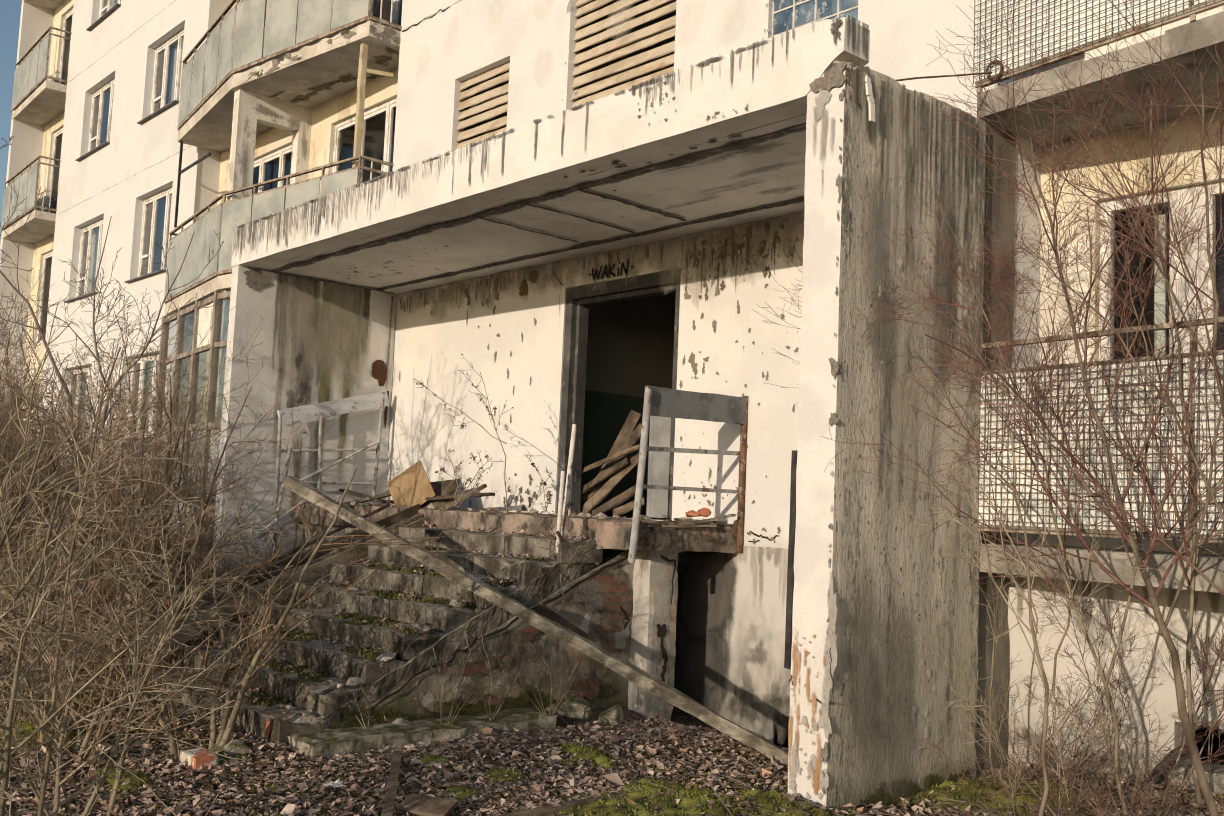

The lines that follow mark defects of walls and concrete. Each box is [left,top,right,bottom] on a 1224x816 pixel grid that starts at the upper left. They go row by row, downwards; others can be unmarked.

water stain [256,47,399,159]
spalling [326,22,401,49]
water stain [631,28,794,126]
rust [371,296,393,428]
peeling [399,272,525,394]
water stain [232,106,834,514]
peeling [679,351,746,396]
spalling [829,357,843,387]
water stain [830,15,990,505]
flaking render [573,569,633,654]
water stain [674,551,789,741]
peeling [789,506,847,805]